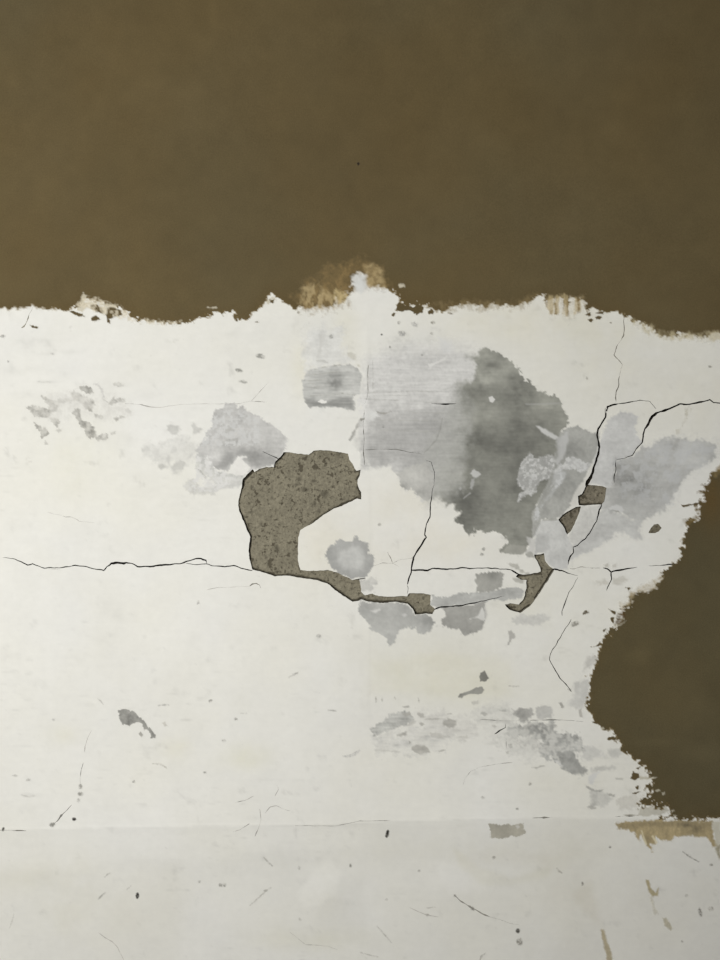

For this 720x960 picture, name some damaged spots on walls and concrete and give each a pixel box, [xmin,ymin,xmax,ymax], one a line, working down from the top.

damp [296,261,406,314]
crack [585,320,720,486]
peeling [140,318,720,647]
crack [355,393,519,594]
damp [681,514,700,528]
crack [3,557,261,590]
crack [434,596,501,610]
crack [549,505,673,691]
peeling [117,708,168,739]
damp [711,820,720,861]